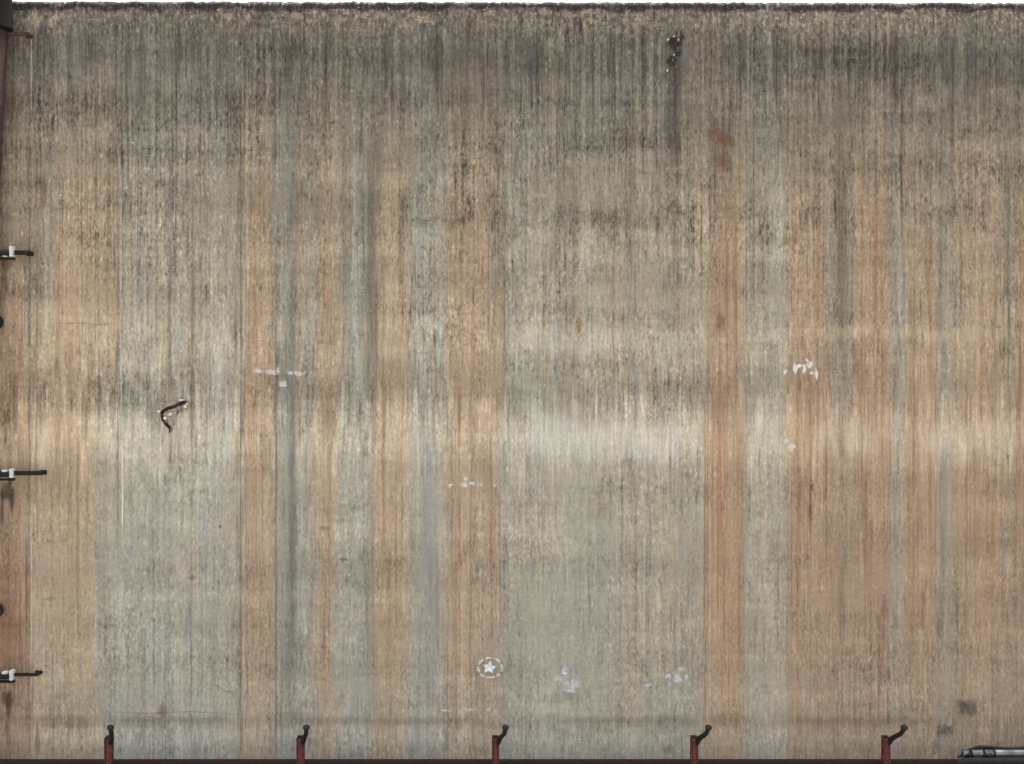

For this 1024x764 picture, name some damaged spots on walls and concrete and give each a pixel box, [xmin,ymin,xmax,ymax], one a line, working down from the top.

leakage [667,31,684,66]
spalling [157,399,189,432]